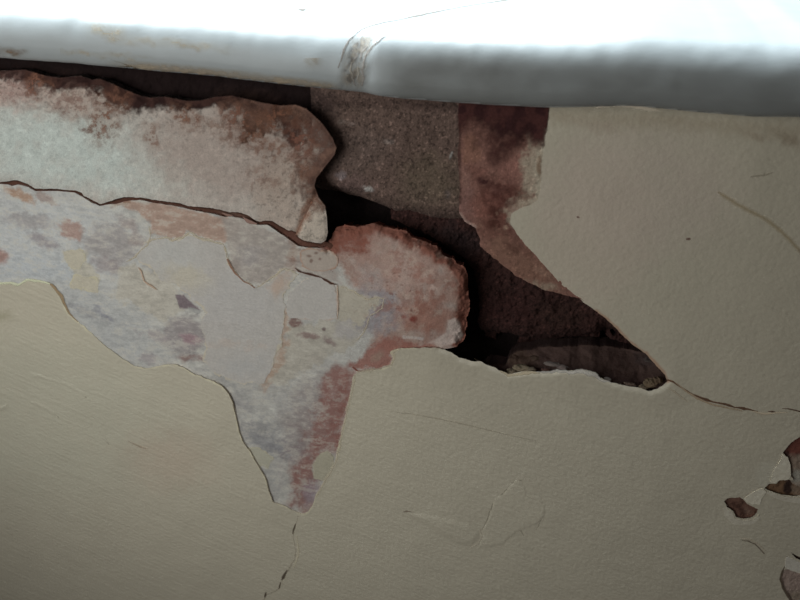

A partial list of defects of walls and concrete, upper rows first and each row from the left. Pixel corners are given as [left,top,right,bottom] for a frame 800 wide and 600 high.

leakage [0,70,336,211]
leakage [458,103,549,159]
crack [0,180,333,249]
crack [295,268,337,285]
peeling [0,68,667,513]
crack [667,379,800,415]
spalling [722,437,800,526]
crack [264,524,299,598]
spalling [779,554,800,600]